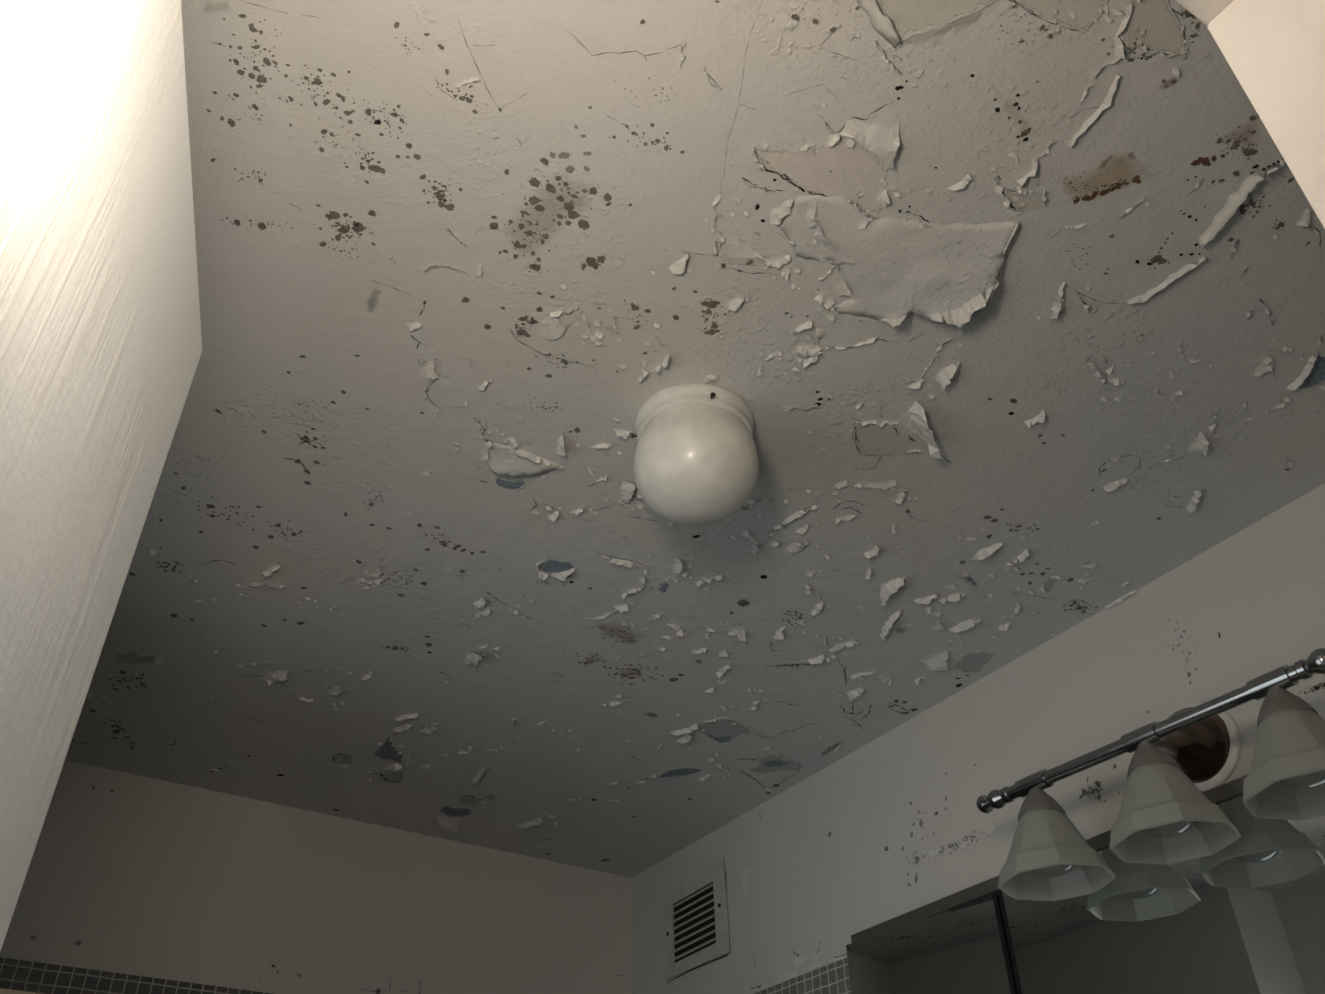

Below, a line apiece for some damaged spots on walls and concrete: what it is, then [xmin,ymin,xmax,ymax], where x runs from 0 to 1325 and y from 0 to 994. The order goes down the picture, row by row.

leakage [206,13,462,210]
leakage [313,204,376,260]
leakage [431,69,477,114]
leakage [489,125,612,272]
crack [569,0,763,256]
leakage [694,290,726,336]
crack [819,35,908,100]
flaking render [651,101,1081,387]
rust [1063,154,1141,204]
flaking render [441,379,676,530]
flaking render [1101,325,1325,470]
peeling [515,330,1141,860]